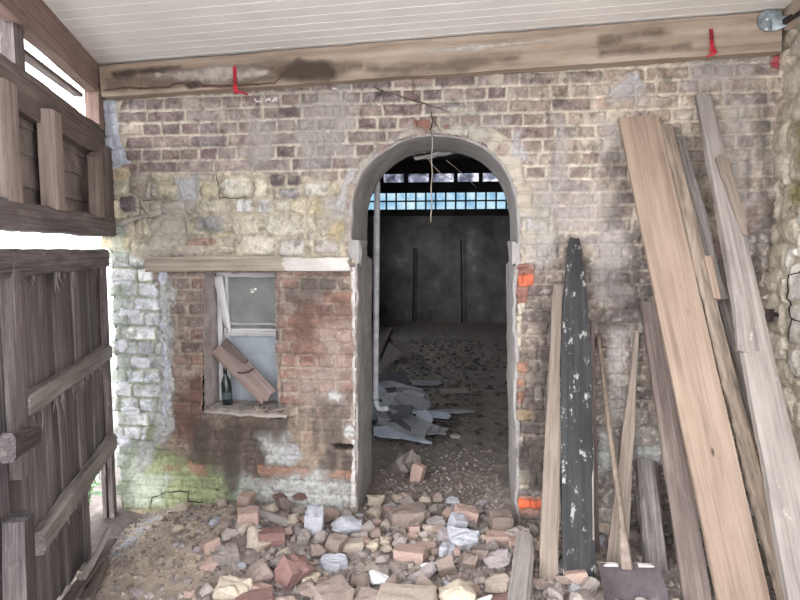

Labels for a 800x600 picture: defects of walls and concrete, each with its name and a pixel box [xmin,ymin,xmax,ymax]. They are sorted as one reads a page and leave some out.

water stain [104,41,548,91]
water stain [600,36,659,55]
crack [373,87,449,137]
crack [216,175,256,199]
spalling [516,263,535,350]
crack [786,271,800,340]
spalling [517,363,533,420]
water stain [344,425,355,438]
water stain [185,418,352,510]
crack [149,488,220,507]